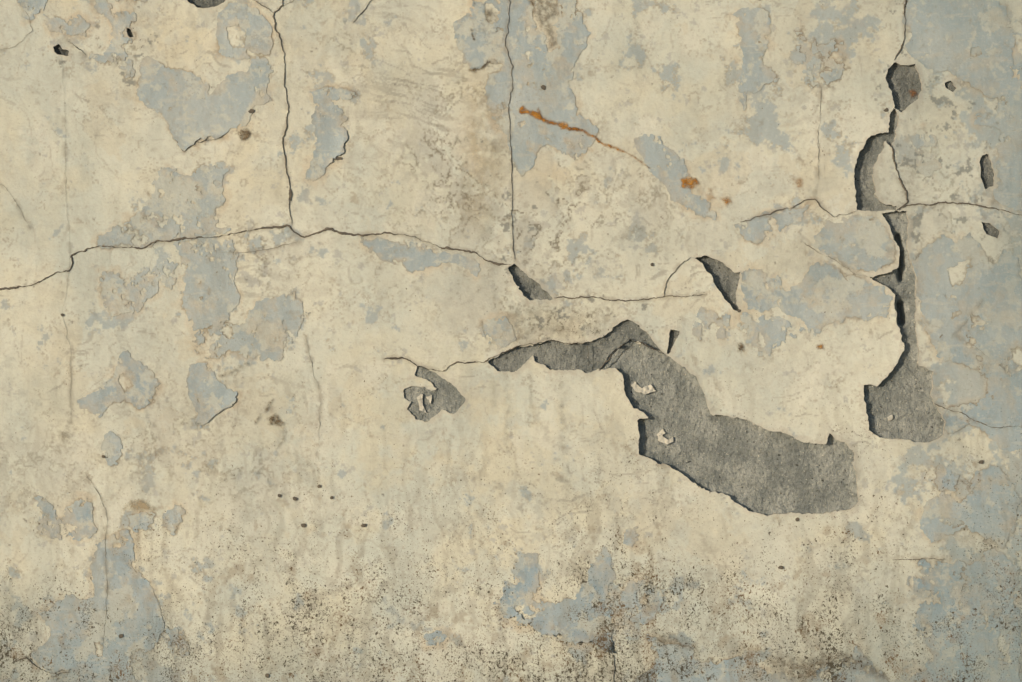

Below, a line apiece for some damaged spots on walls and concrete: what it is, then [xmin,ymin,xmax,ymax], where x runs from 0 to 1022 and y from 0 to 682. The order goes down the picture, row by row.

peeling [89,0,273,151]
crack [0,0,515,393]
rust [519,106,623,152]
peeling [634,134,717,221]
crack [742,92,852,222]
crack [891,145,1019,215]
spalling [508,264,553,300]
crack [557,263,706,302]
peeling [692,63,1022,452]
spalling [403,366,465,422]
crack [385,338,656,371]
spalling [478,316,858,515]